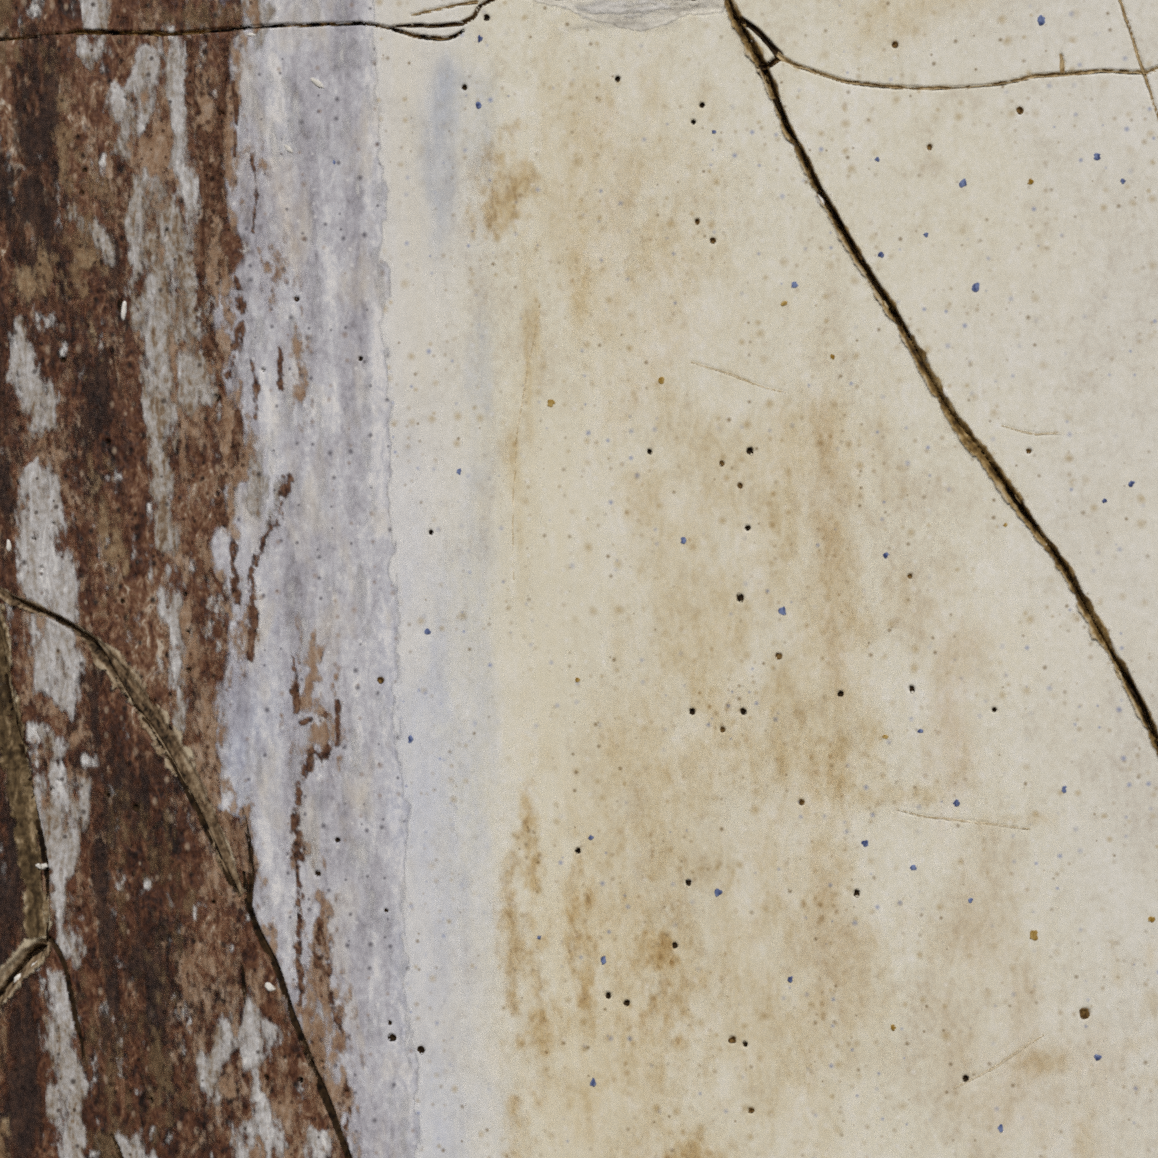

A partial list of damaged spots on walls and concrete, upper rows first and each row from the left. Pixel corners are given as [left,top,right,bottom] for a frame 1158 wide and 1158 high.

crack [0,0,495,41]
spalling [535,0,725,31]
crack [724,0,1158,755]
corrosion [0,0,360,1158]
crack [0,587,352,1158]
peeling [196,998,288,1158]
peeling [304,1126,331,1158]